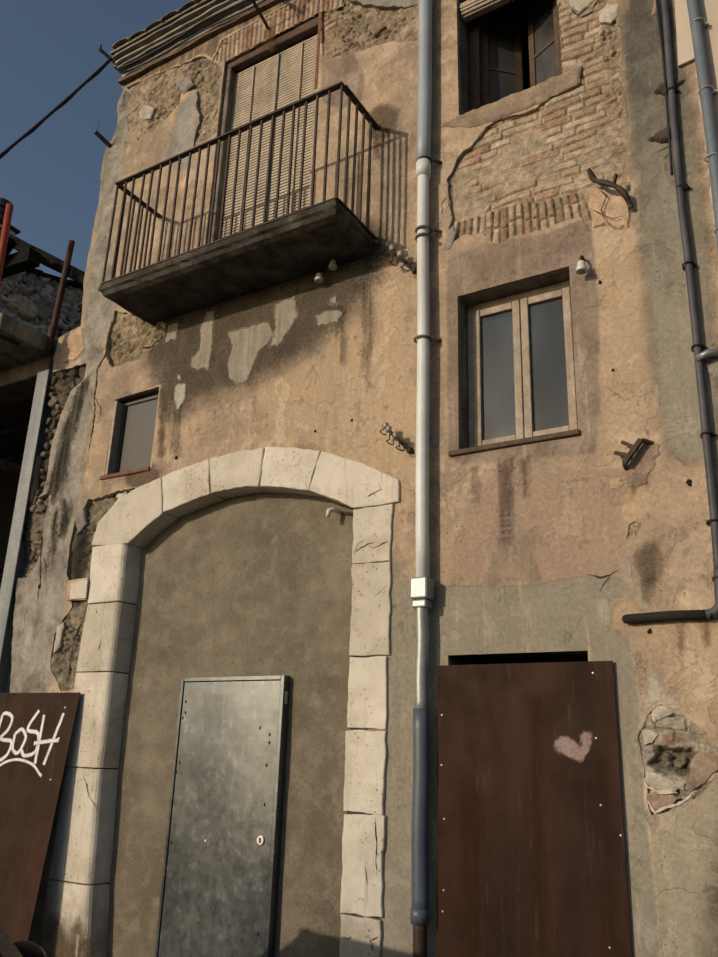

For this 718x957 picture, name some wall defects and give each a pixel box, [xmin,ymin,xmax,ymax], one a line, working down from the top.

flaking render [127,0,419,146]
flaking render [445,0,632,250]
flaking render [106,312,178,367]
peeling [191,310,214,370]
peeling [228,297,299,384]
peeling [315,296,342,325]
flaking render [70,486,139,580]
damp [620,544,656,610]
flaking render [51,601,88,691]
flaking render [638,670,718,815]